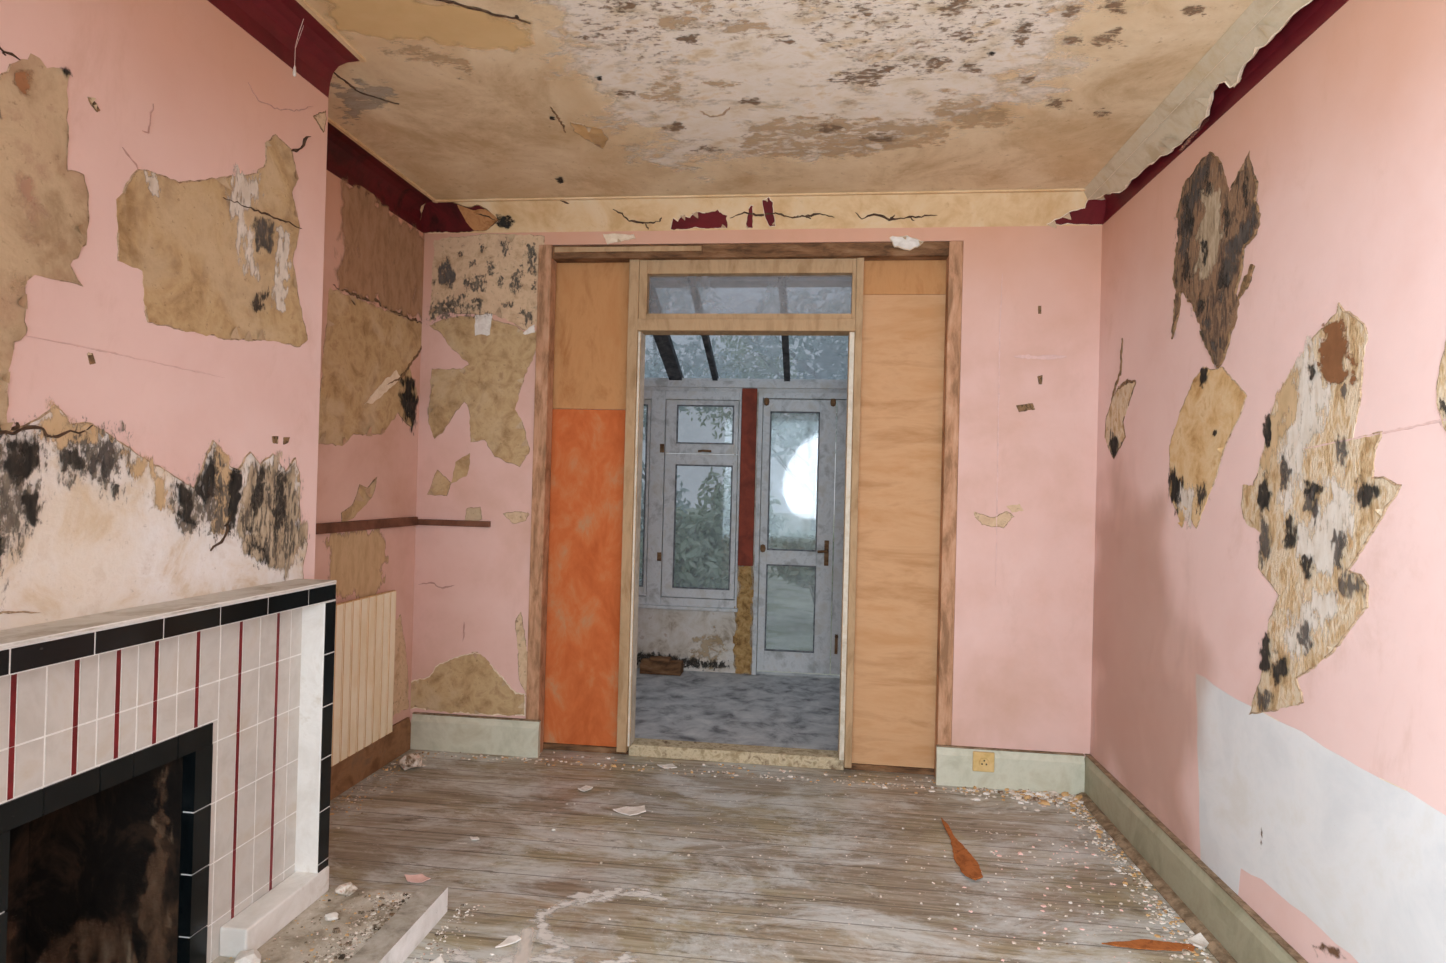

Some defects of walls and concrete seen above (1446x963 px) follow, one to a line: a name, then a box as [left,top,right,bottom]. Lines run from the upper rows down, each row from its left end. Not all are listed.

water stain [570,0,755,63]
peeling [534,0,1086,179]
water stain [811,124,844,134]
water stain [777,0,1127,89]
flaking render [0,53,308,630]
peeling [116,110,536,496]
crack [613,209,662,230]
crack [731,211,936,221]
peeling [1168,151,1261,529]
water stain [0,416,135,586]
water stain [167,447,389,598]
peeling [1196,302,1446,963]